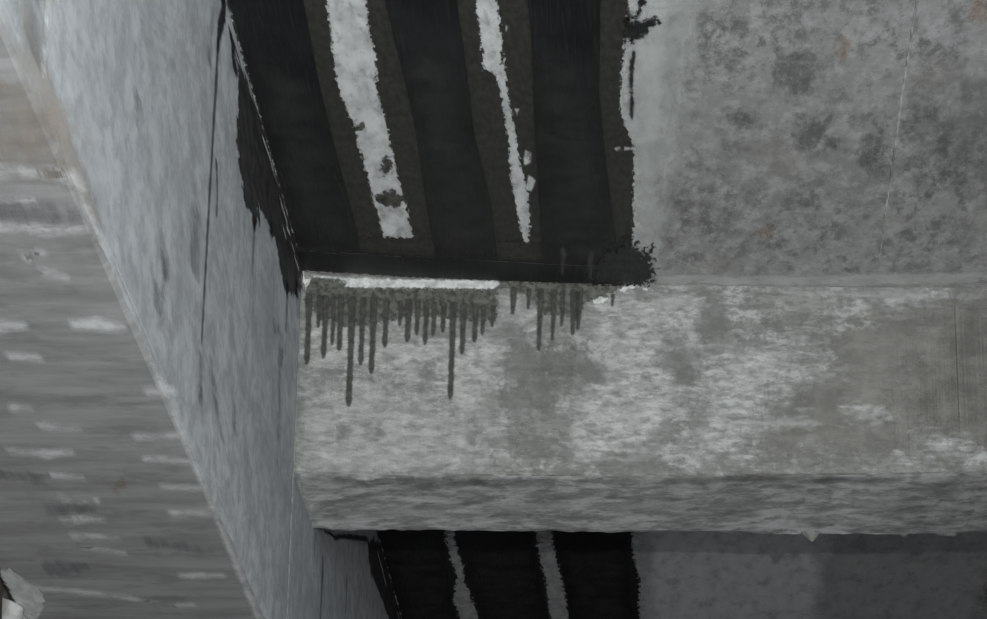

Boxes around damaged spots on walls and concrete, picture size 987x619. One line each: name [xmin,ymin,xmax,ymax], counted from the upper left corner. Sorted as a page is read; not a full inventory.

water stain [228,25,704,468]
water stain [657,272,987,461]